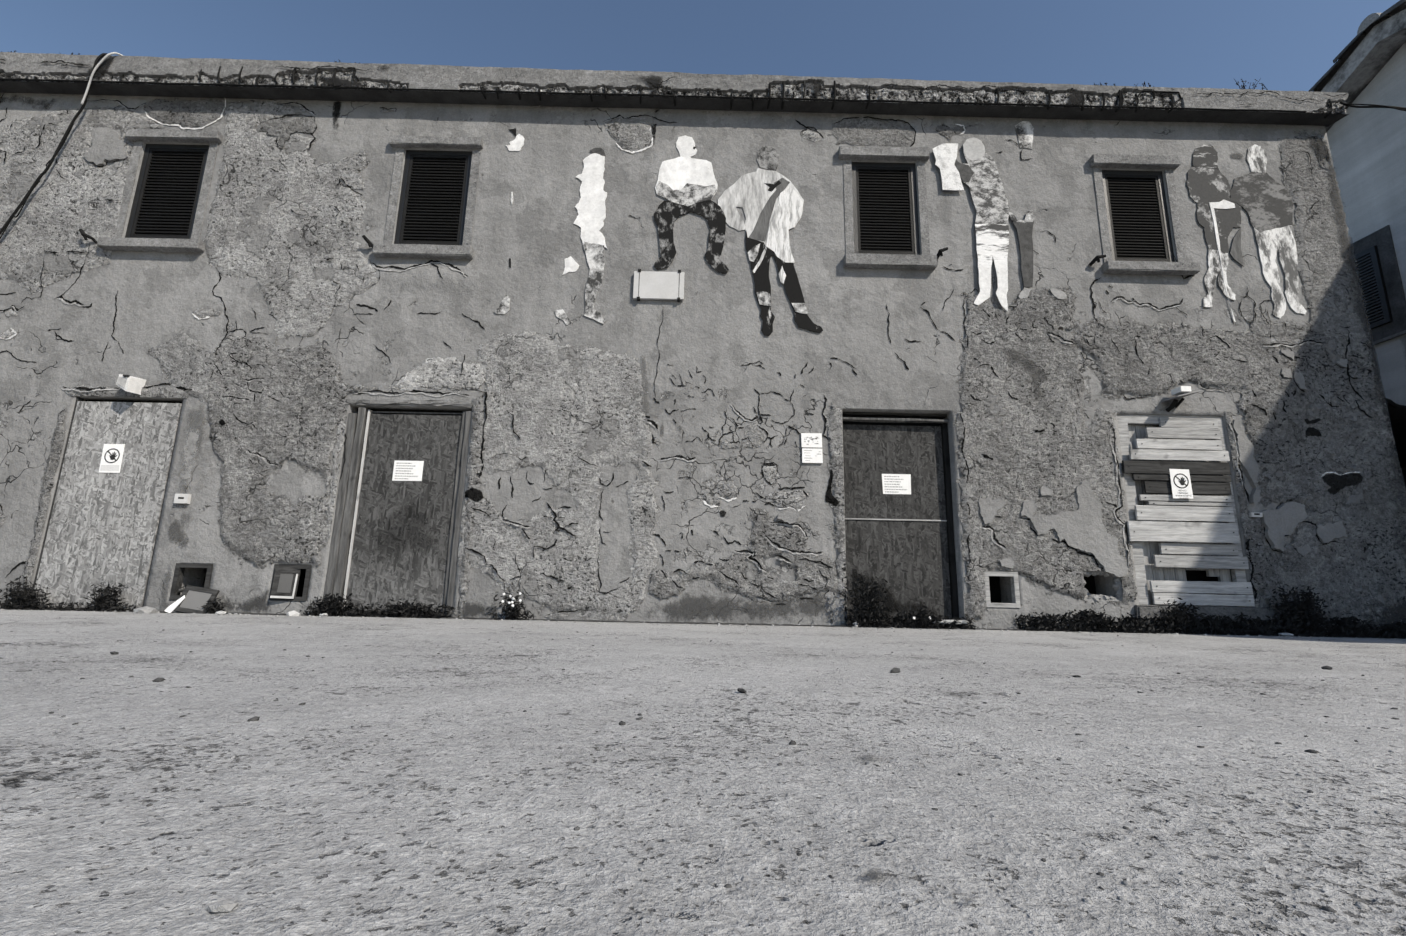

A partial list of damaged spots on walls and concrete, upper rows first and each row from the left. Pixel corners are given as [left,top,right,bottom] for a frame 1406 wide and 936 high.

crack [234,65,378,184]
crack [291,178,363,228]
crack [605,77,677,137]
crack [881,83,996,147]
crack [1198,91,1350,105]
crack [1293,151,1319,214]
crack [0,245,289,466]
flaking render [0,66,1406,631]
crack [314,258,857,605]
crack [886,256,1373,601]